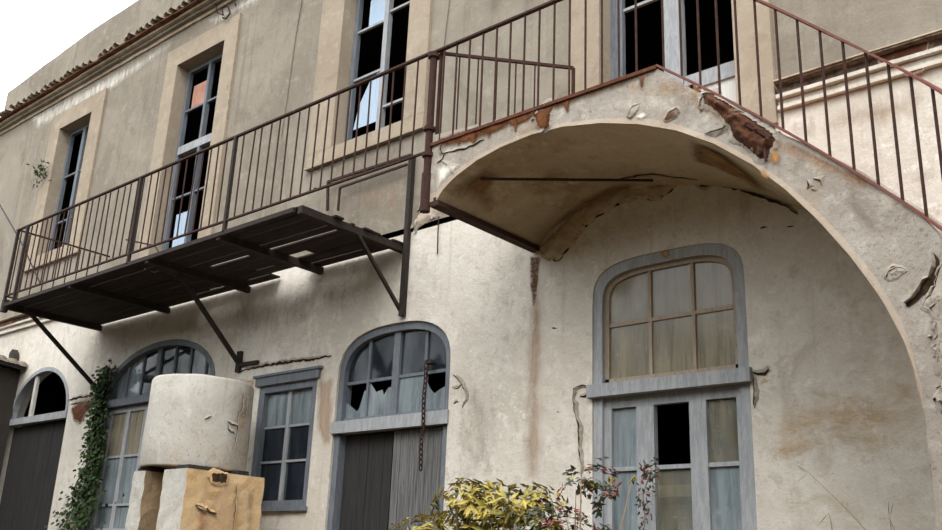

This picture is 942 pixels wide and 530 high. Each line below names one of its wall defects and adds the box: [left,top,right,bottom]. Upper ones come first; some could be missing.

corrosion [440,99,569,146]
spalling [626,103,645,119]
spalling [663,106,681,123]
spalling [699,87,780,165]
leakage [530,314,538,382]
spalling [903,251,942,414]
crack [572,384,586,474]